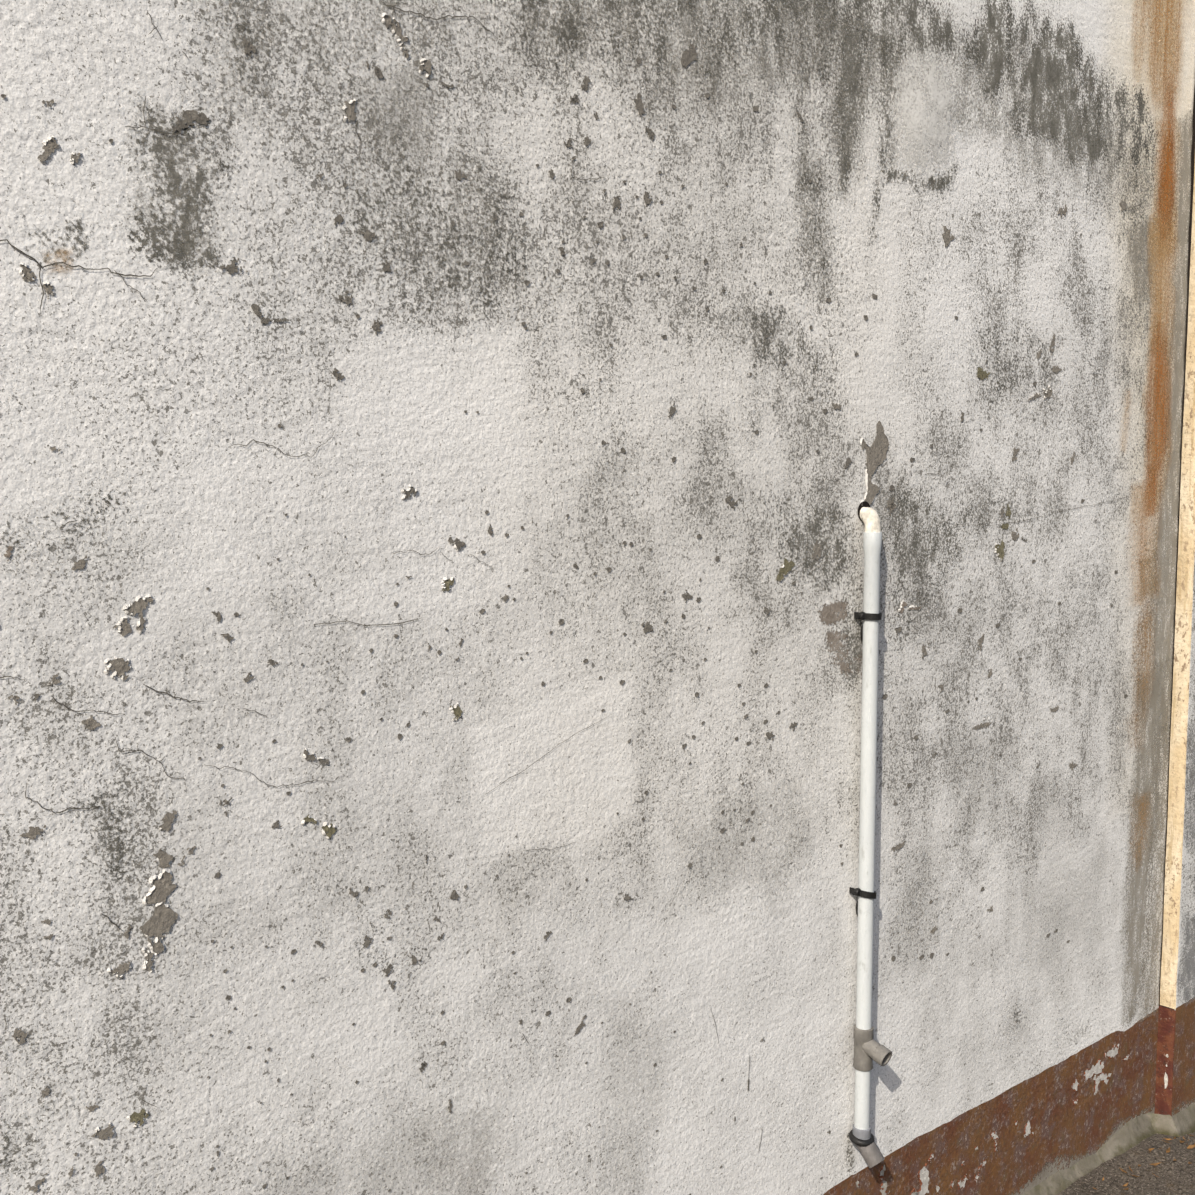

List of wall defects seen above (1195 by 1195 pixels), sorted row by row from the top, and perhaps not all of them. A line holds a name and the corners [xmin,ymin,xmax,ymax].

water stain [128,101,233,281]
water stain [333,85,541,325]
crack [0,239,159,310]
corrosion [1133,0,1178,731]
water stain [474,0,1195,1025]
peeling [845,421,897,516]
crack [52,684,337,791]
crack [25,783,100,816]
water stain [68,781,157,886]
peeling [107,846,196,979]
peeling [1071,1044,1131,1105]
water stain [0,1126,42,1177]